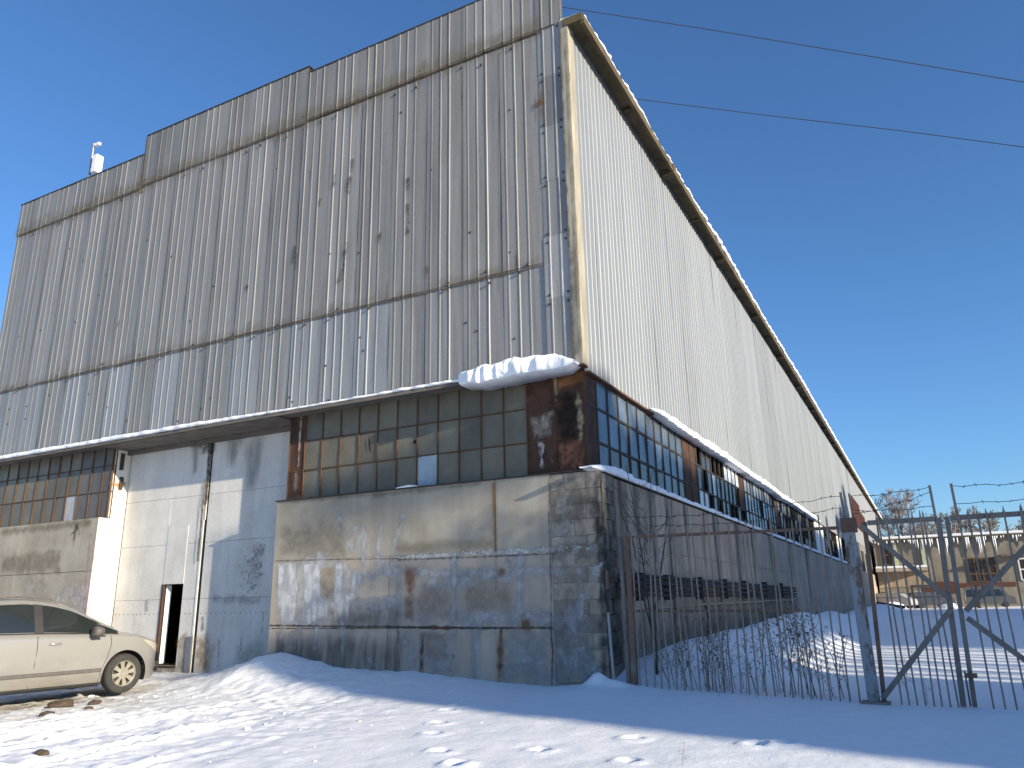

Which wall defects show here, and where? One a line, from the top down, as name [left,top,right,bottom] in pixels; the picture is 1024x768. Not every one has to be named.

peeling [532,372,584,470]
water stain [277,643,350,667]